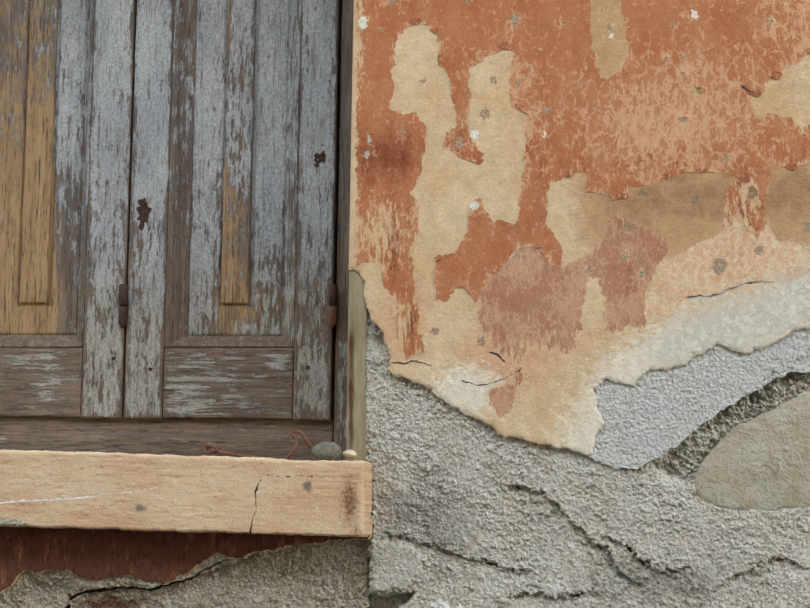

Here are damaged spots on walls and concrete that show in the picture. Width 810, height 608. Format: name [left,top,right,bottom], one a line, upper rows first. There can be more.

peeling [350,0,810,469]
crack [65,560,226,608]
spalling [0,309,810,608]
crack [597,541,682,581]